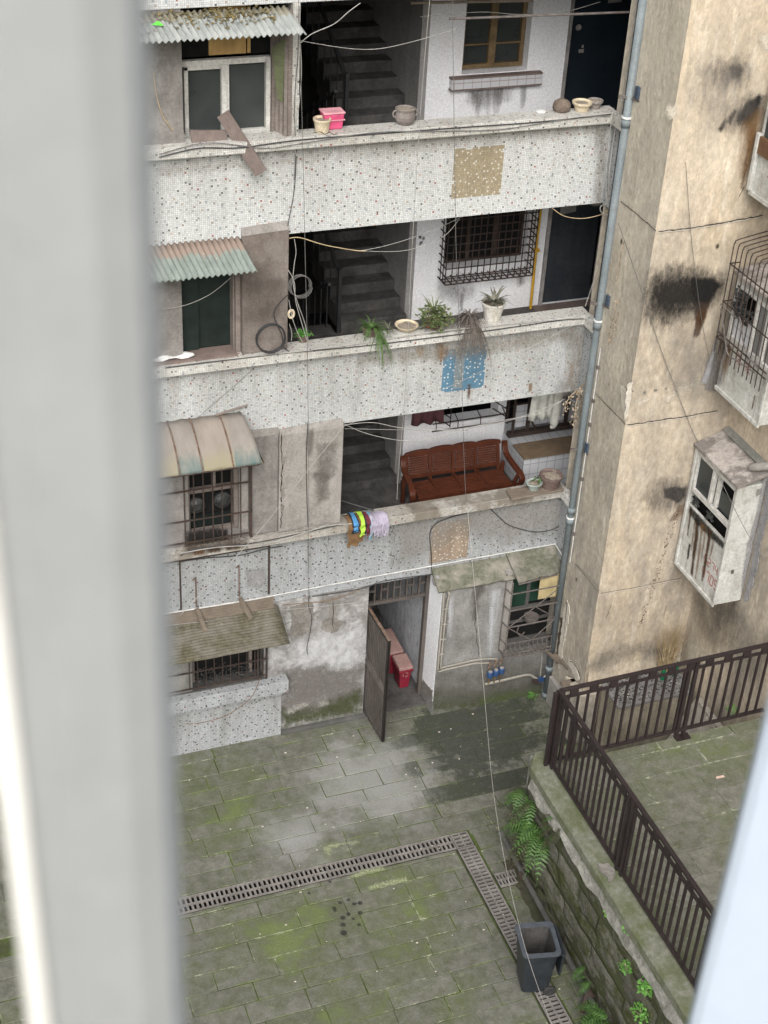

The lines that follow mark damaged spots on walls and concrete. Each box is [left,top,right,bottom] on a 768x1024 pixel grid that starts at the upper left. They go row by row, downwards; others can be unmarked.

crack [279,434,287,528]
rust [687,507,724,580]
water stain [281,628,364,728]